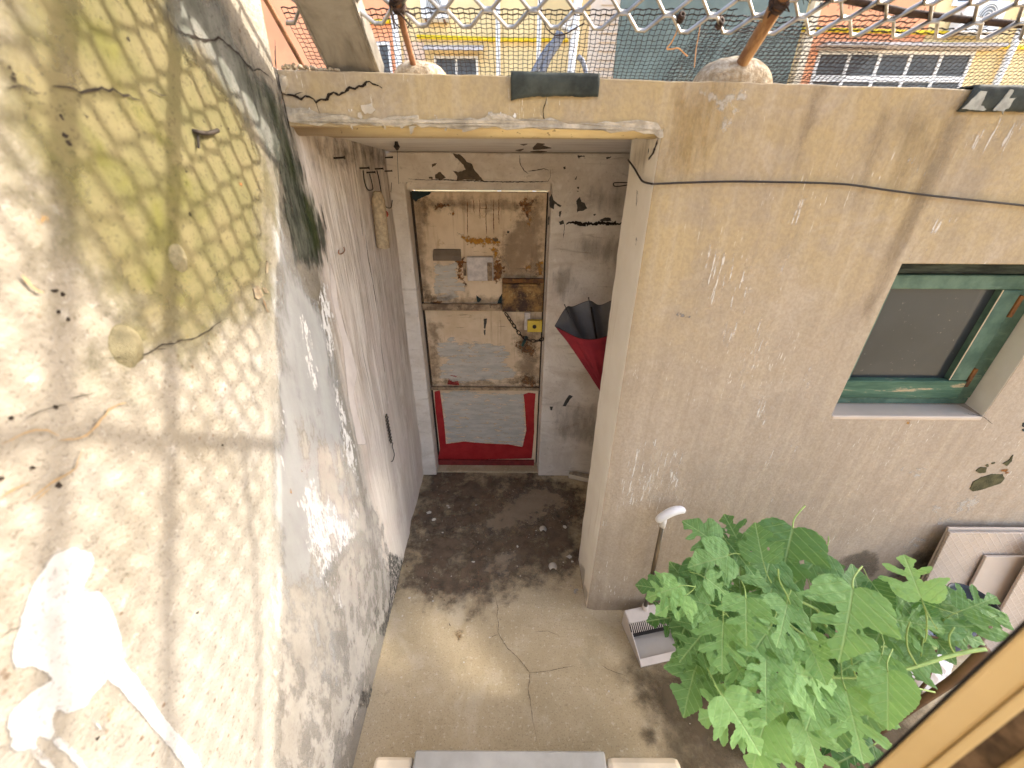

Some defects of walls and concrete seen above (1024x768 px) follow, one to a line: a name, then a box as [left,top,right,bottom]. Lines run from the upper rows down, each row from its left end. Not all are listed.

crack [164,0,382,137]
crack [5,85,165,100]
peeling [429,153,484,181]
peeling [515,143,550,153]
water stain [302,194,320,253]
peeling [412,191,431,202]
rust [455,200,505,285]
rust [519,198,535,227]
crack [112,318,226,358]
spalling [969,455,1013,491]
peeling [269,381,394,768]
crack [492,591,571,739]